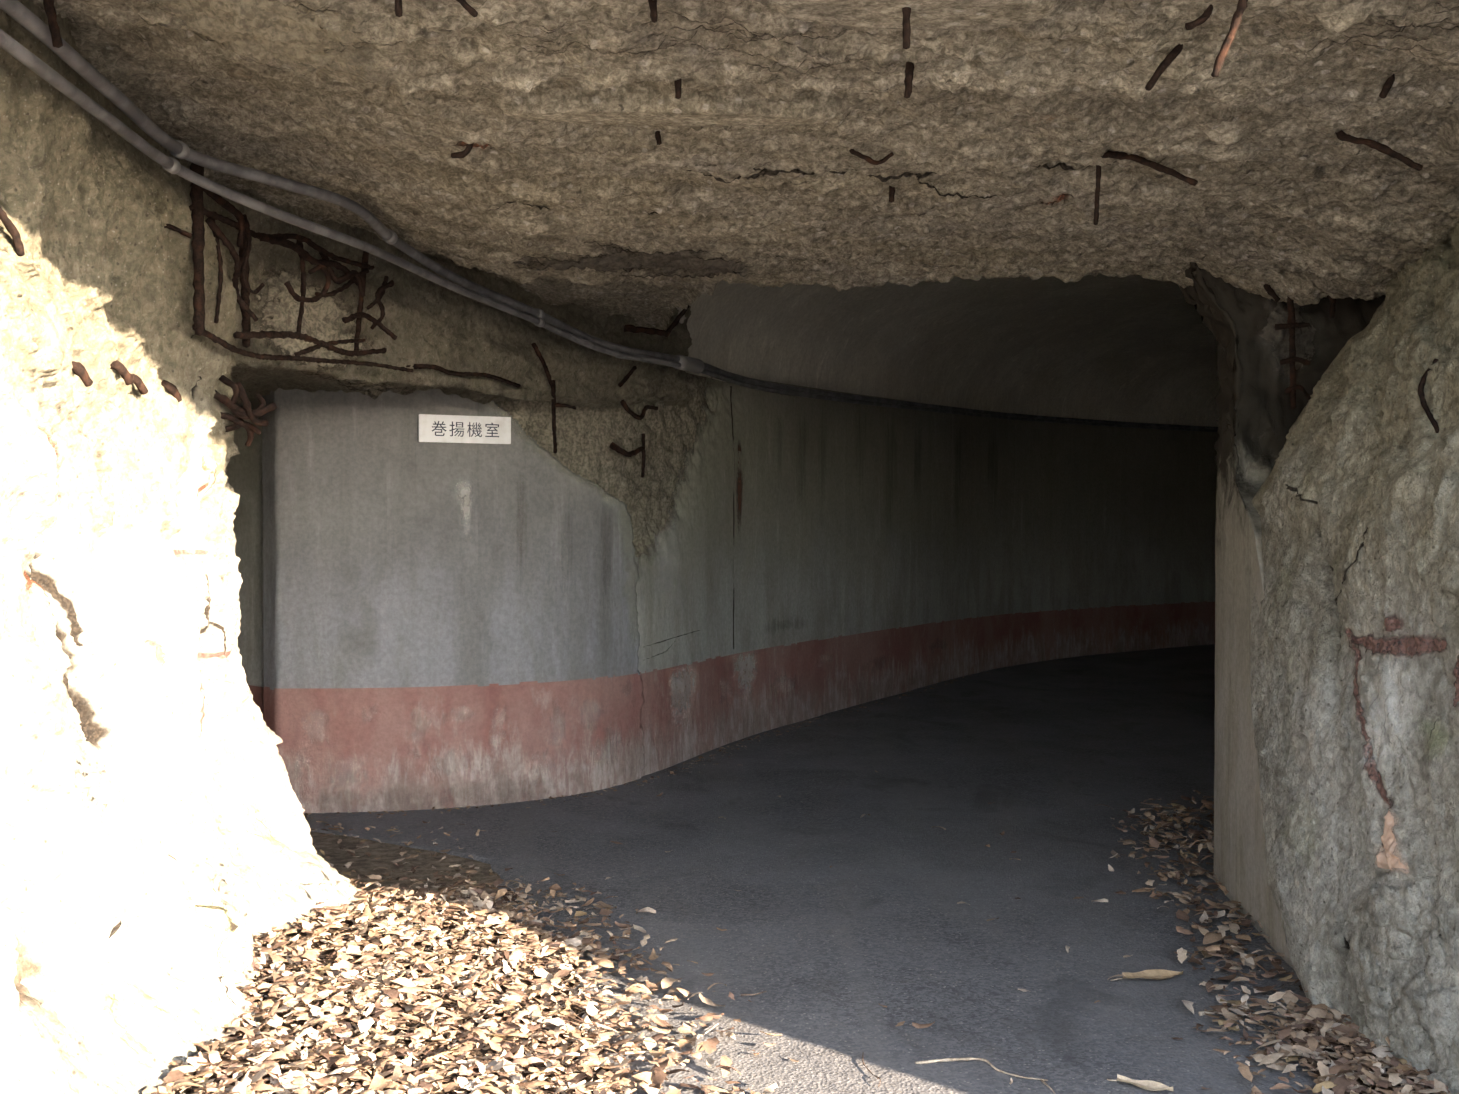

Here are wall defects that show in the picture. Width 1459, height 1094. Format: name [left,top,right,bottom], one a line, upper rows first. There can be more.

rust [902,7,915,98]
rust [1145,4,1213,91]
rust [1093,151,1198,225]
rust [1335,130,1423,171]
spalling [513,241,748,278]
spalling [254,267,415,399]
spalling [1256,284,1336,410]
rust [1418,358,1439,433]
spalling [496,371,709,560]
crack [25,553,110,749]
rust [1345,615,1459,870]
crack [108,895,122,940]